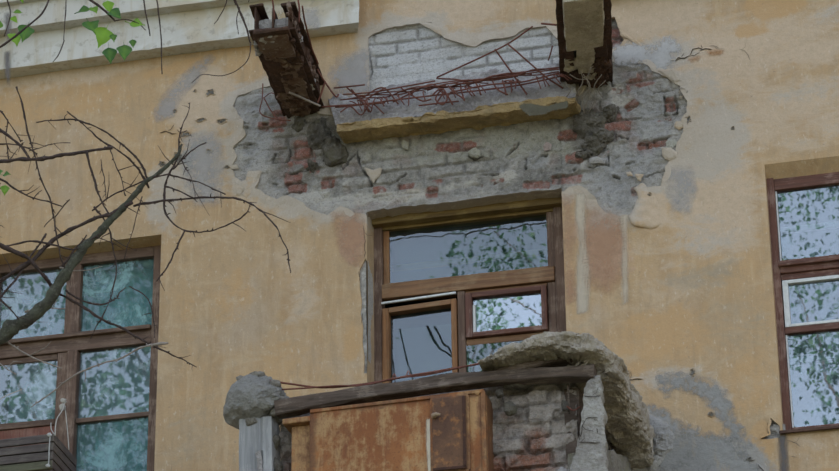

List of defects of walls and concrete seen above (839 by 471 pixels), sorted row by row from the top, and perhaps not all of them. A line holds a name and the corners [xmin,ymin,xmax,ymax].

crack [671,45,718,61]
flaking render [223,6,691,216]
peeling [658,368,752,446]
flaking render [760,419,786,439]